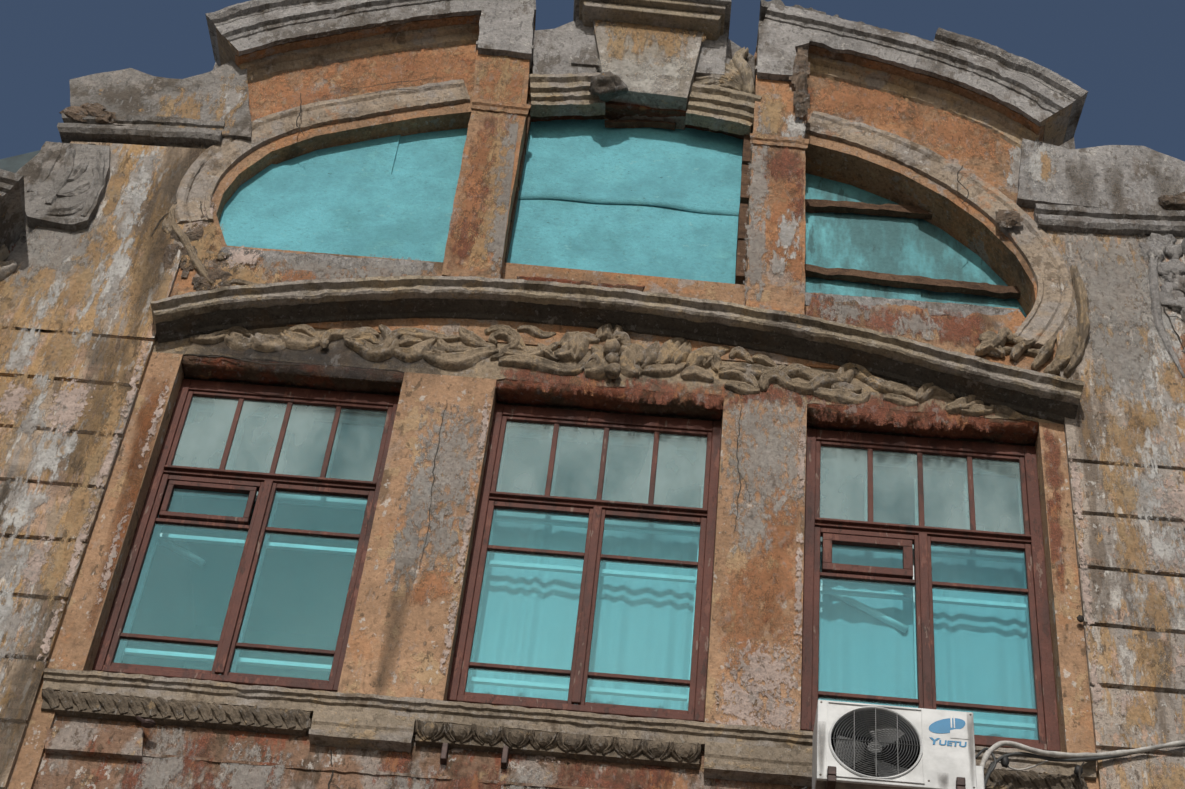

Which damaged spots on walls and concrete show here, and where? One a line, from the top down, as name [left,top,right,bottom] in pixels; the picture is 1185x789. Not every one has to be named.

peeling [0,47,525,692]
crack [419,406,447,569]
peeling [804,292,985,347]
peeling [1044,428,1152,734]
peeling [1088,245,1185,683]
peeling [122,727,290,789]